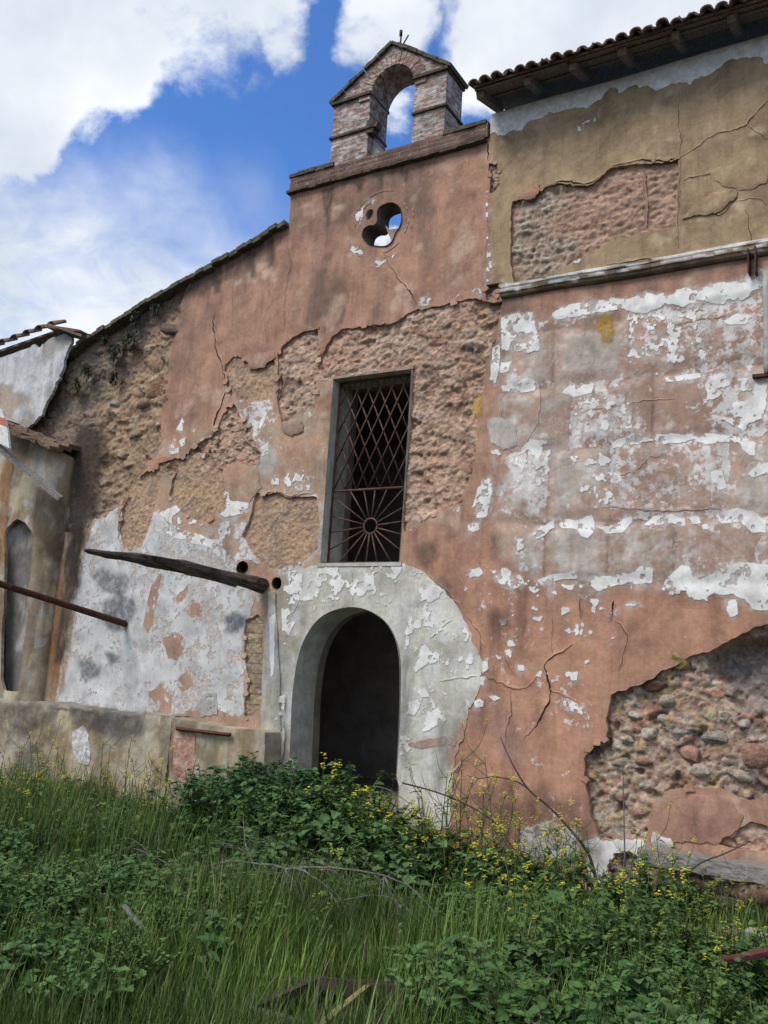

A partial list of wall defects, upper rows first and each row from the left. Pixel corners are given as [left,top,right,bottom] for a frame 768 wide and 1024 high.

crack [550,91,768,265]
crack [211,304,228,434]
flaking render [13,155,681,728]
peeling [552,273,768,504]
peeling [276,695,285,759]
peeling [400,681,463,755]
crack [427,575,576,746]
peeling [469,562,768,622]
peeling [516,508,766,551]
flaking render [519,625,768,925]